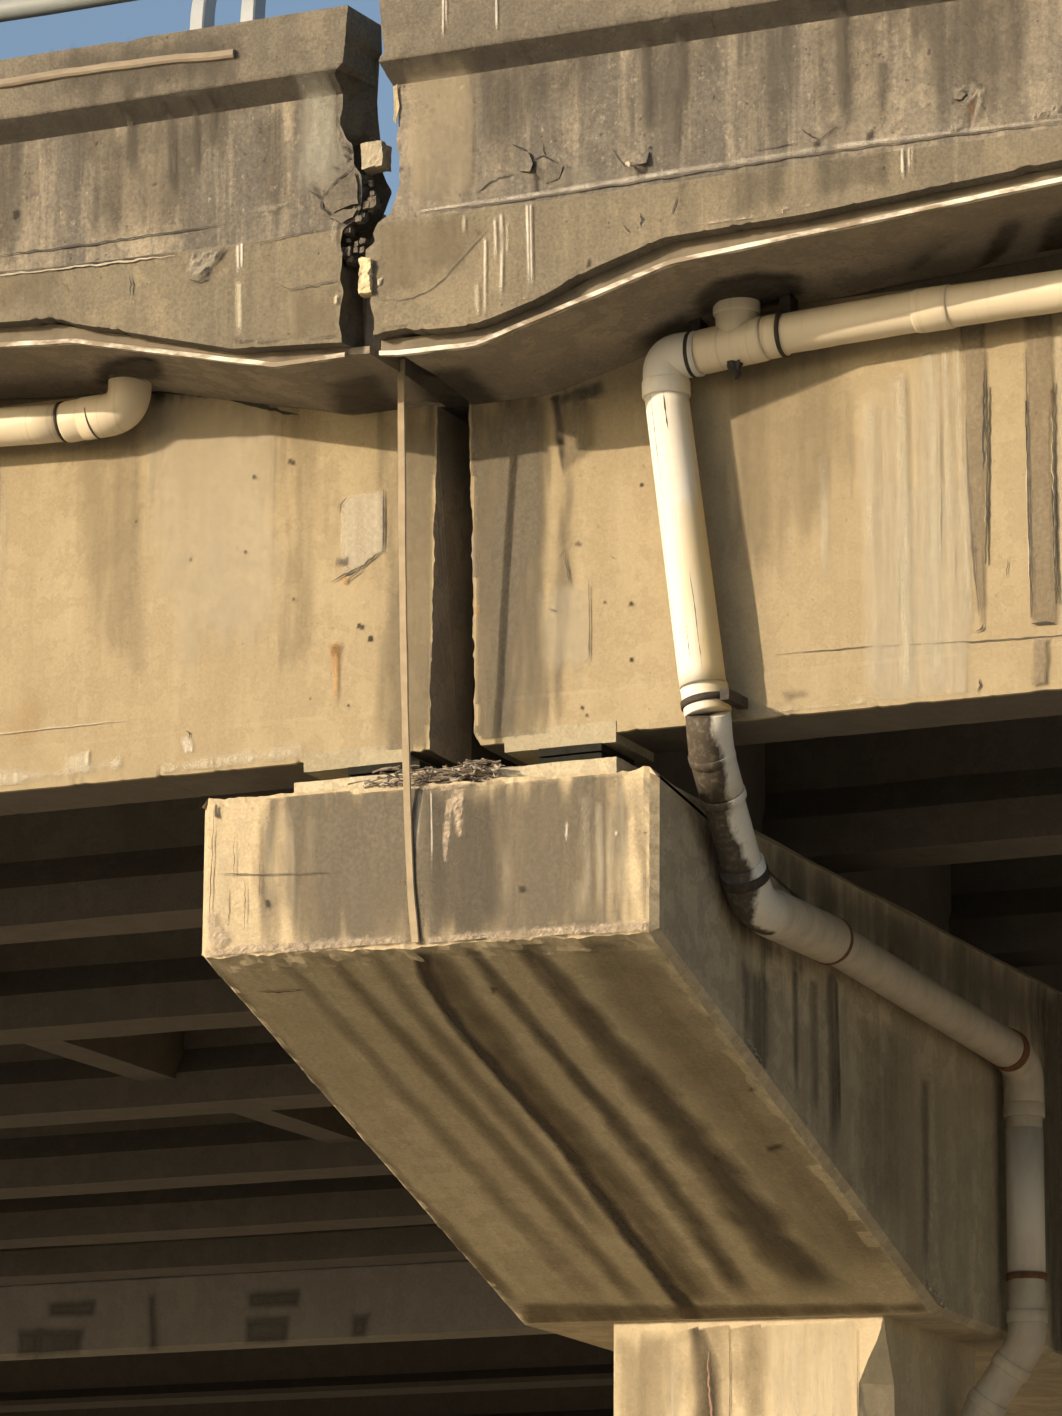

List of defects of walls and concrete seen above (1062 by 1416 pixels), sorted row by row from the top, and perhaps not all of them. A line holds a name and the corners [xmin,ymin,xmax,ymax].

crack [254,146,359,244]
water stain [419,373,558,739]
water stain [924,344,969,675]
water stain [265,774,920,1416]
water stain [19,1303,93,1355]
water stain [248,1292,298,1342]